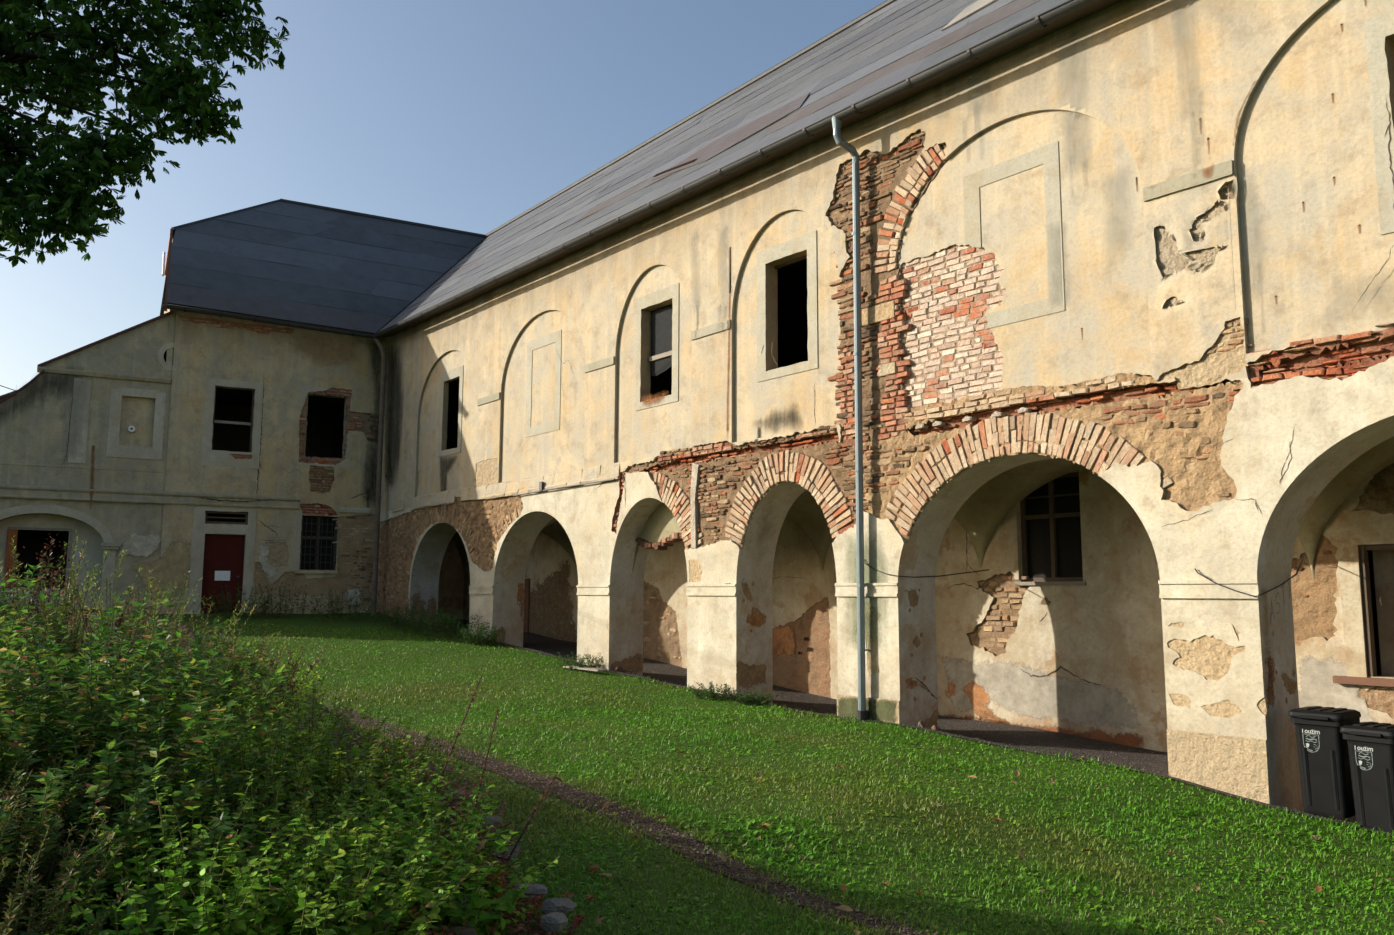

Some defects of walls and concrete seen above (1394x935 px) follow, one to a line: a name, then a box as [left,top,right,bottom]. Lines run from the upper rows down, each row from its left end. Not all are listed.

crack [1384,98,1394,211]
crack [1352,245,1394,311]
flaking render [611,129,1394,582]
water stain [755,411,798,441]
flaking render [255,388,523,626]
crack [1021,666,1100,685]
flaking render [1167,535,1394,722]